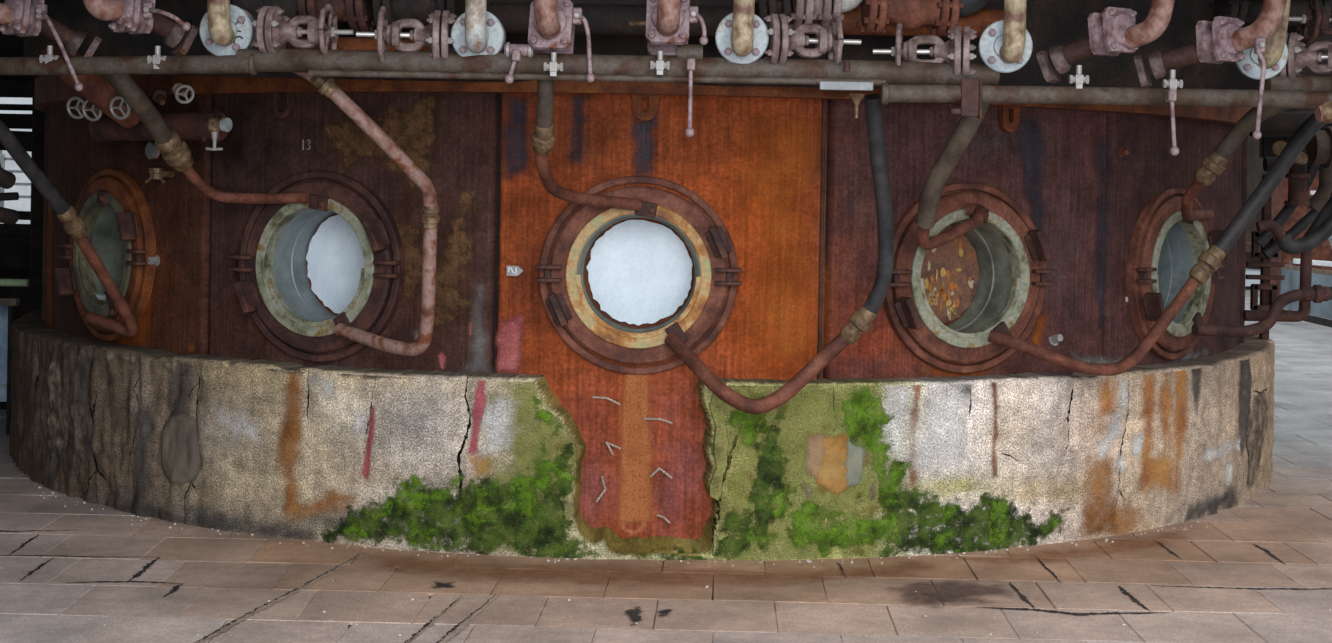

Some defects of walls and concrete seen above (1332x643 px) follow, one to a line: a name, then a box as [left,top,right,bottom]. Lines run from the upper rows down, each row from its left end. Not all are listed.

rust [279,374,349,514]
crack [457,375,471,553]
water stain [483,400,510,451]
spalling [537,378,712,556]
spalling [703,393,728,500]
crack [712,425,742,556]
water stain [882,385,909,453]
water stain [918,384,969,463]
rust [1100,384,1113,412]
rust [1141,370,1187,489]
water stain [1186,359,1252,522]